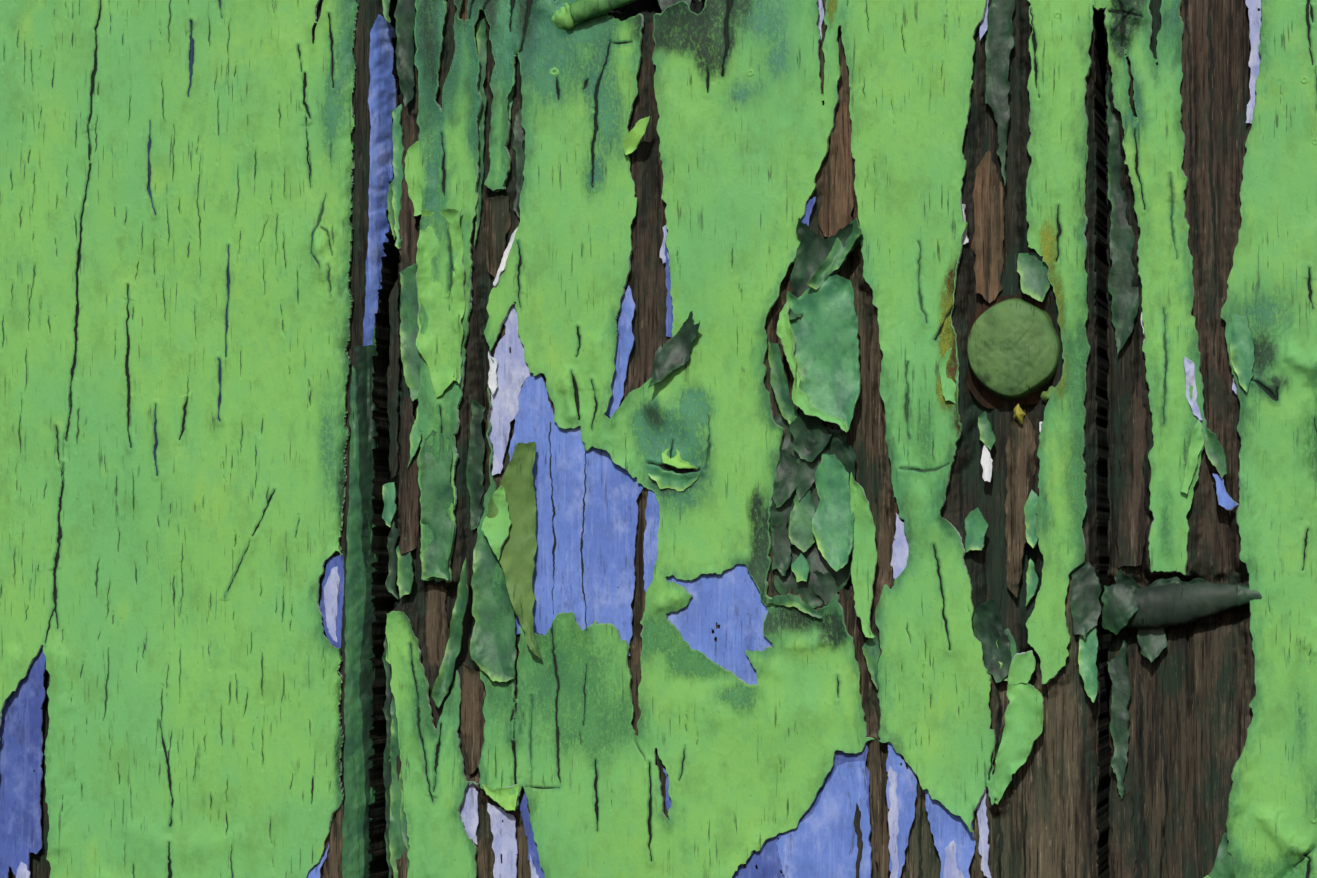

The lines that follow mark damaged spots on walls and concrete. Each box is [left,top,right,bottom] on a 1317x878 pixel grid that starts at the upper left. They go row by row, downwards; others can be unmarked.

crack [1306,0,1317,90]
crack [1306,268,1314,308]
crack [1251,379,1278,401]
crack [0,0,334,878]
peeling [366,0,1262,878]
crack [1301,529,1309,571]
peeling [0,646,51,878]